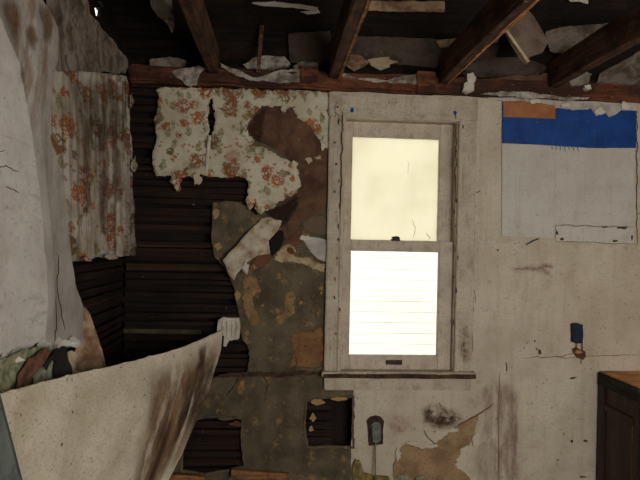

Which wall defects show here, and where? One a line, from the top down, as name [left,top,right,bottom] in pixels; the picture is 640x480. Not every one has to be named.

peeling [211,106,344,341]
crack [54,258,65,342]
peeling [289,326,324,368]
crack [531,352,636,360]
damp [138,349,213,480]
flaking render [303,395,355,450]
spalling [352,404,493,480]
mould [425,403,459,433]